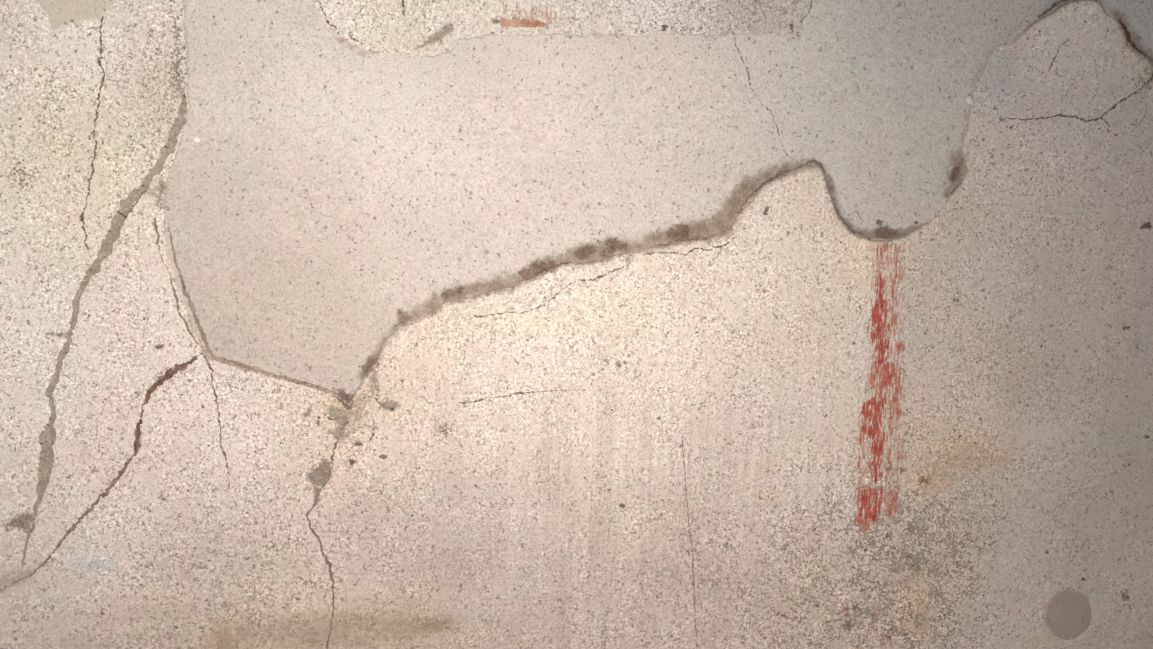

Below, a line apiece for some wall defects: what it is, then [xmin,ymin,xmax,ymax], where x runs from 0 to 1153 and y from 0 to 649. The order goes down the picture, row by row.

crack [999,74,1153,127]
spalling [1115,13,1153,65]
crack [5,16,230,577]
spalling [169,159,918,505]
crack [305,446,335,649]